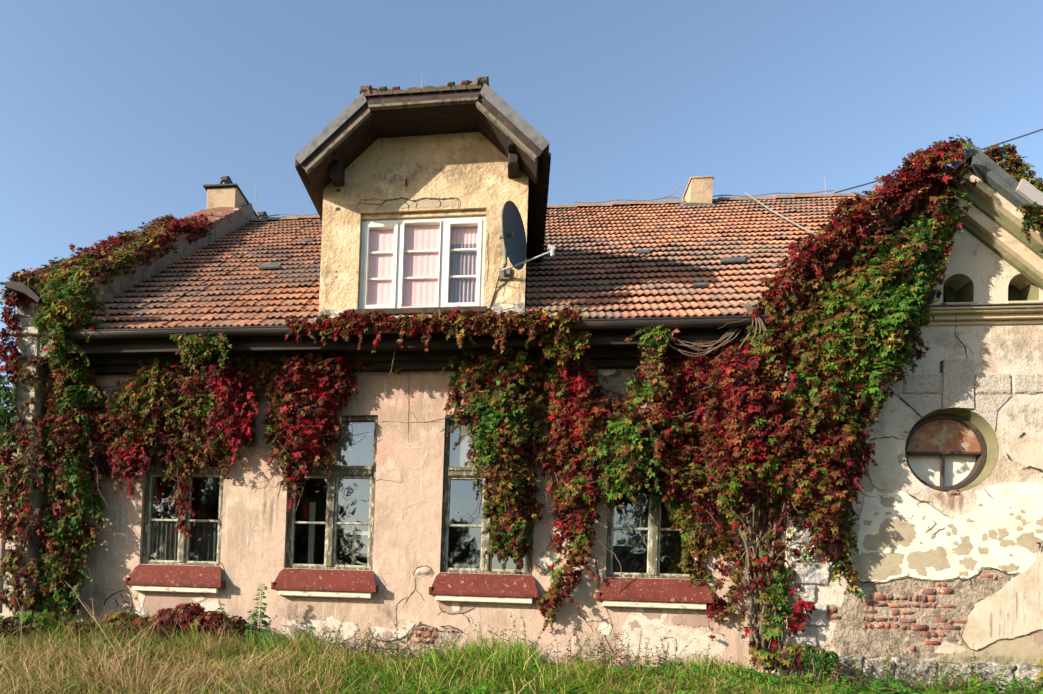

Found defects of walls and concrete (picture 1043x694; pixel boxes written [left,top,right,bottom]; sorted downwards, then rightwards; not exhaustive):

crack [356,196,459,208]
crack [1007,432,1043,473]
crack [907,493,951,538]
peeling [826,434,1043,665]
peeling [283,616,462,647]
crack [369,578,477,642]
peeling [439,602,478,613]
peeling [598,607,726,659]
crack [858,567,1043,651]